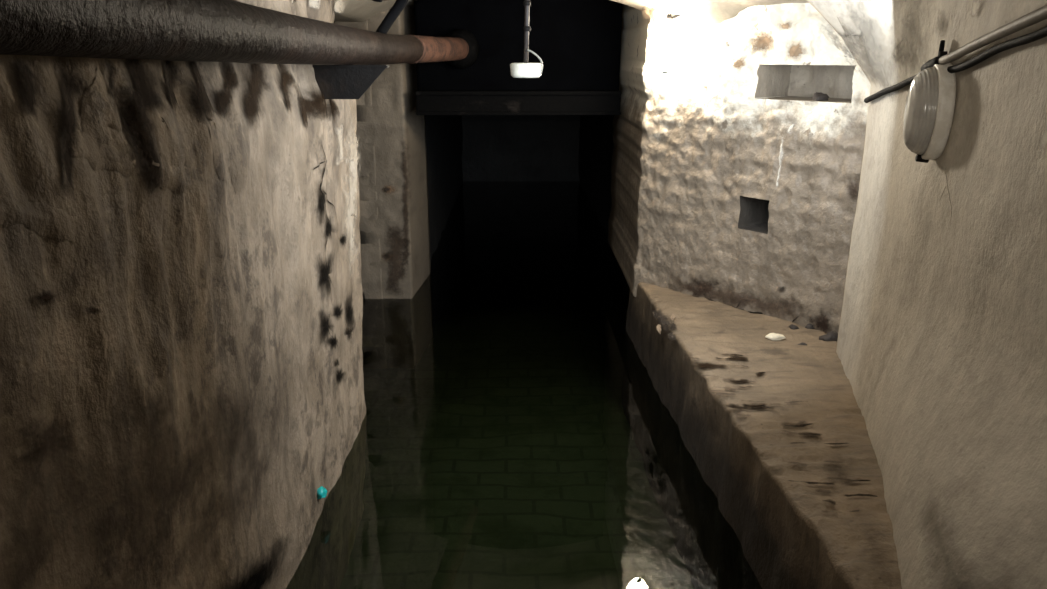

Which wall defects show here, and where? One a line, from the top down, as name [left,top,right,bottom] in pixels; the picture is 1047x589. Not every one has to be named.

leakage [225,539,284,589]